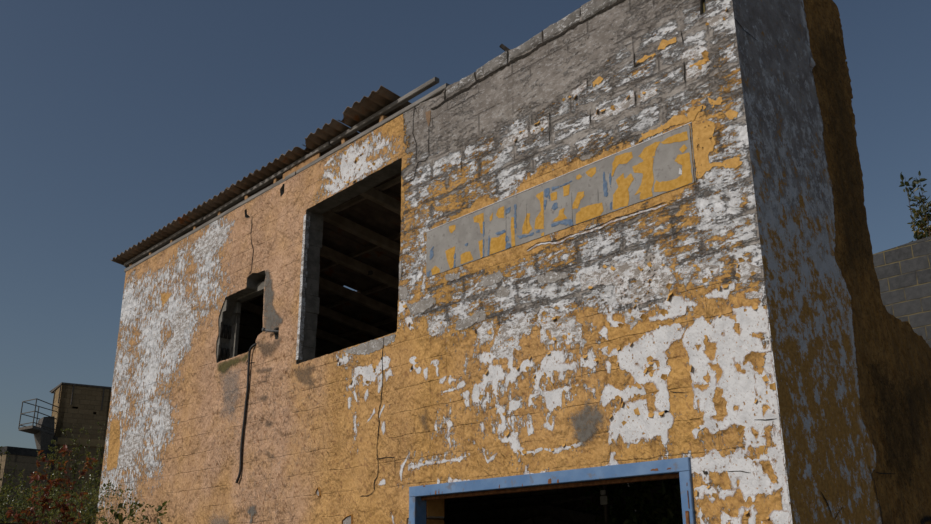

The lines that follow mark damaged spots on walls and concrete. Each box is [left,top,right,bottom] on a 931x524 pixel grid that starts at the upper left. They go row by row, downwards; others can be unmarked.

peeling [555,81,587,104]
peeling [591,87,657,120]
peeling [500,119,549,148]
peeling [324,140,386,195]
crack [527,202,666,251]
peeling [337,334,395,436]
peeling [398,253,791,524]
crack [360,337,395,497]
water stain [571,401,603,446]